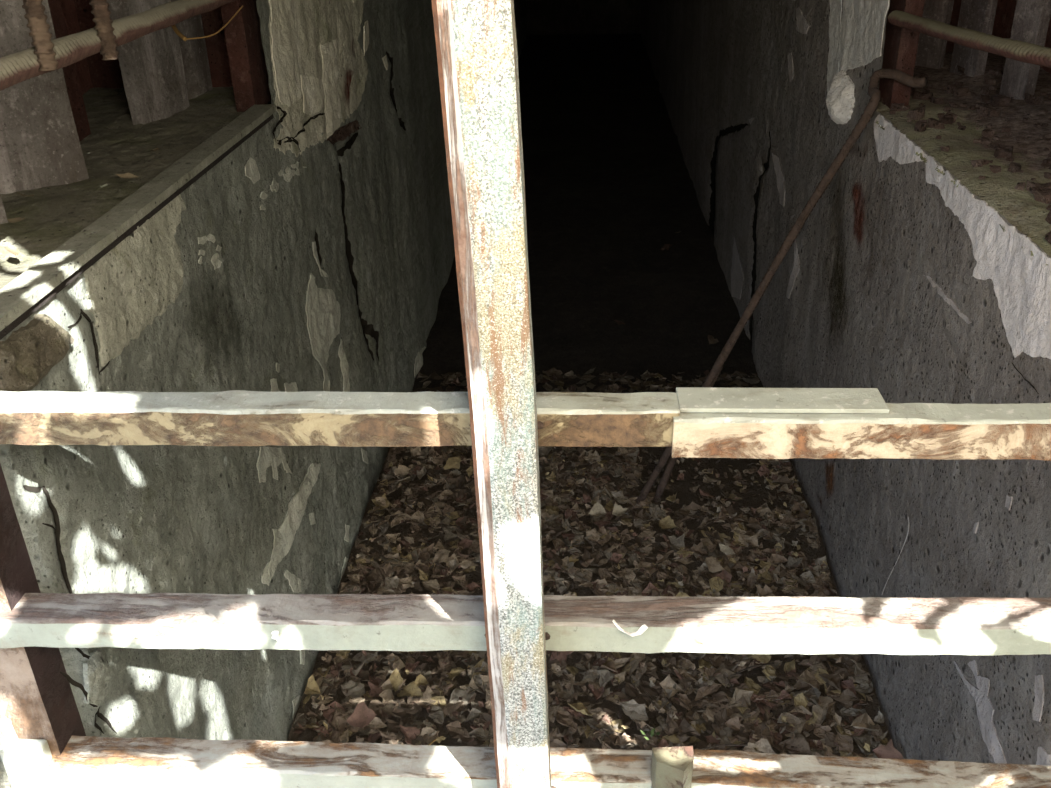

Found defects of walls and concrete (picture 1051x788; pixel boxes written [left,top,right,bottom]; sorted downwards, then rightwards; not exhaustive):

peeling [827,0,890,94]
crack [272,106,379,364]
crack [709,123,771,344]
peeling [874,114,1051,359]
peeling [305,241,350,392]
crack [23,485,72,594]
peeling [256,446,292,483]
peeling [261,463,321,593]
peeling [953,660,1007,764]